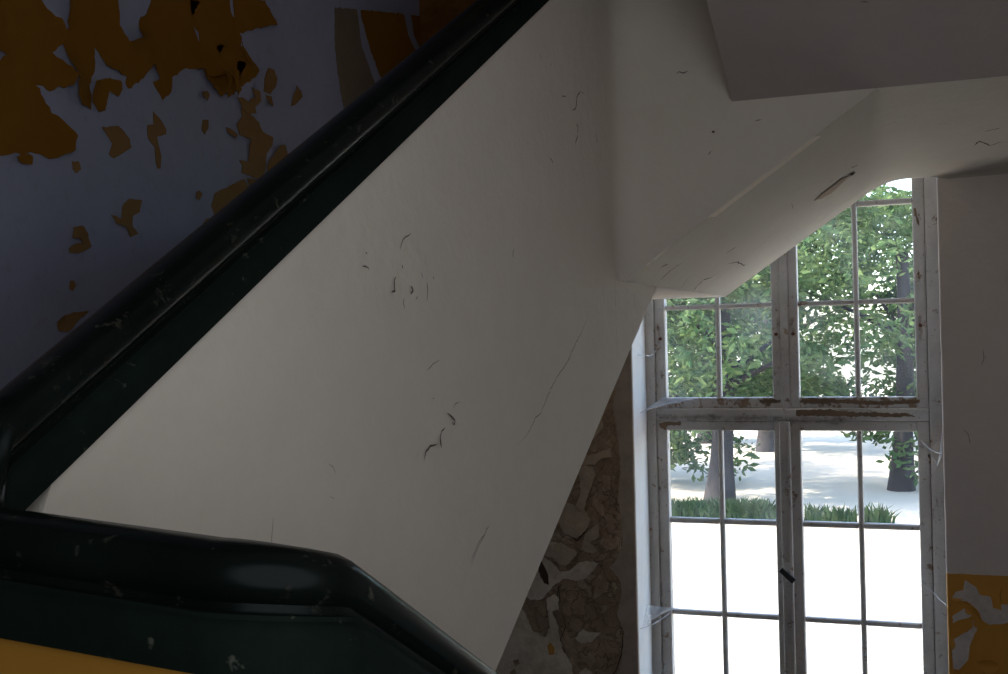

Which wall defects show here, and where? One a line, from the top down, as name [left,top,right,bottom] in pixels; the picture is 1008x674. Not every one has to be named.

flaking render [334,7,421,108]
peeling [0,0,288,223]
peeling [69,226,92,253]
peeling [111,199,142,237]
flaking render [522,377,624,674]
peeling [951,580,1008,672]